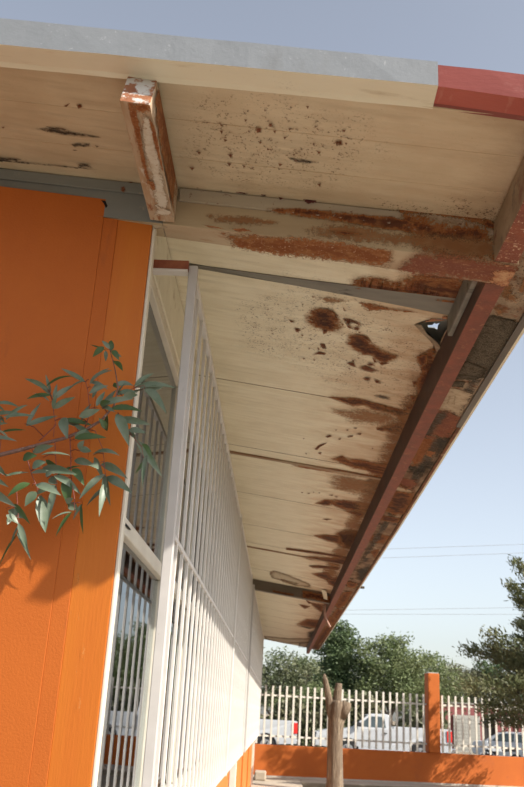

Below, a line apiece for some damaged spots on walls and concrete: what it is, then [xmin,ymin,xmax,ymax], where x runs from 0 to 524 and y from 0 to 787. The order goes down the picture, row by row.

peeling [142,116,173,229]
rust [203,100,362,174]
rust [205,197,524,315]
rust [242,294,435,587]
rust [410,410,461,466]
rust [272,582,358,650]